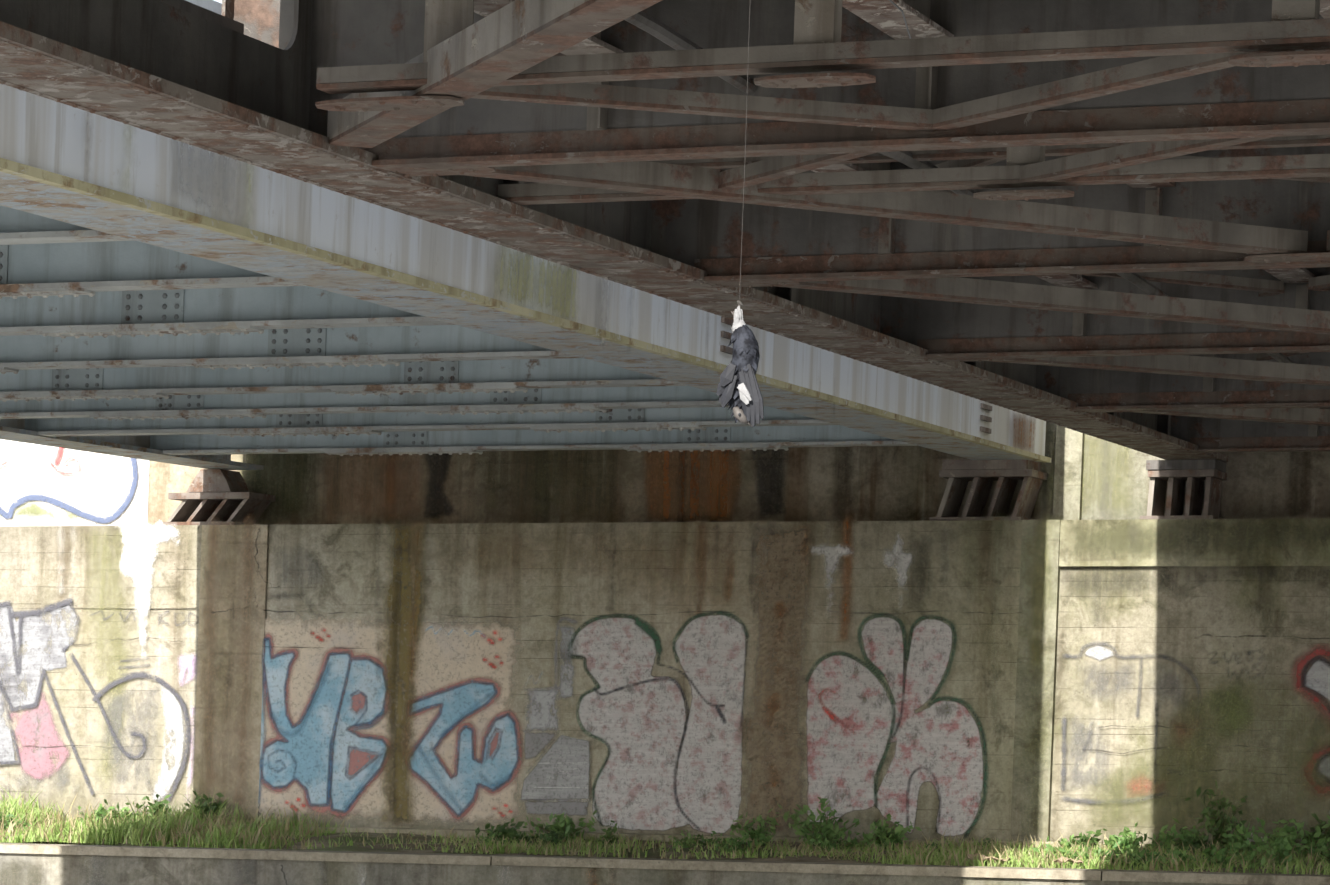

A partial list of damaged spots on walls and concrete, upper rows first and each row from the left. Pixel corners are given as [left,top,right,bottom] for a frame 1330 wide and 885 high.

corrosion [646,450,739,532]
corrosion [1014,417,1035,451]
water stain [121,522,177,639]
water stain [383,453,452,822]